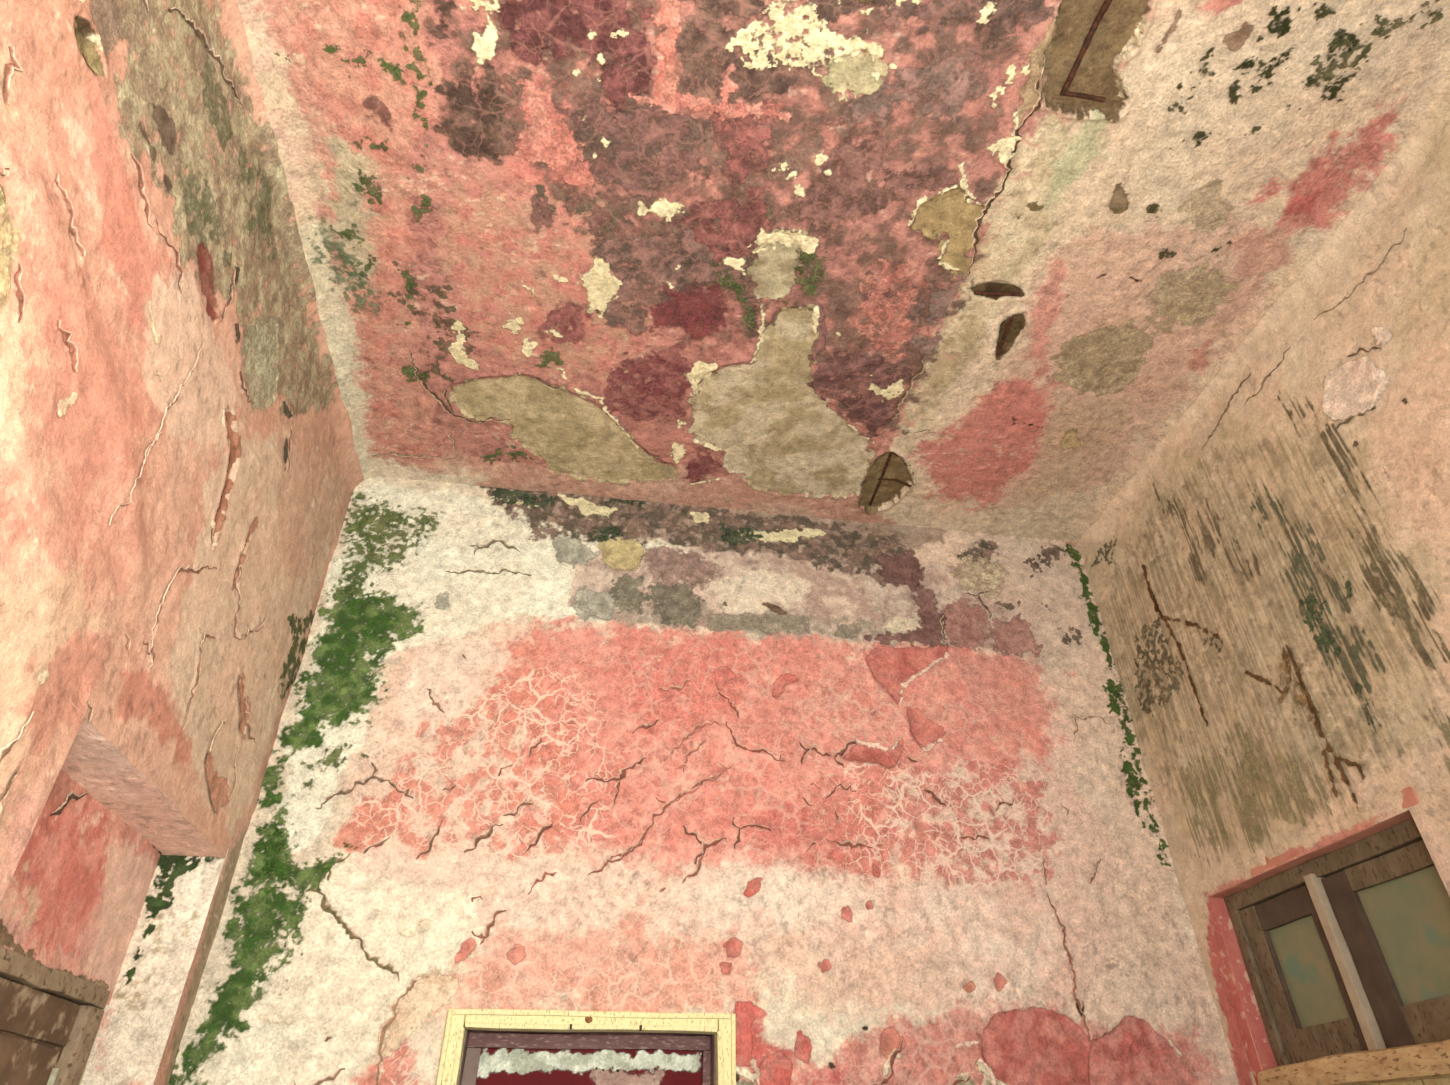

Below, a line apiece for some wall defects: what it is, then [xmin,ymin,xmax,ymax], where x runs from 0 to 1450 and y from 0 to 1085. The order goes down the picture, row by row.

spalling [74,0,104,76]
crack [131,153,183,293]
crack [15,264,78,373]
spalling [448,227,916,515]
spalling [597,537,644,571]
damp [1134,617,1184,717]
damp [1153,483,1261,586]
damp [1248,485,1385,733]
damp [1321,424,1450,669]
crack [294,679,873,1085]
crack [1041,856,1090,1038]
peeling [735,1001,812,1085]